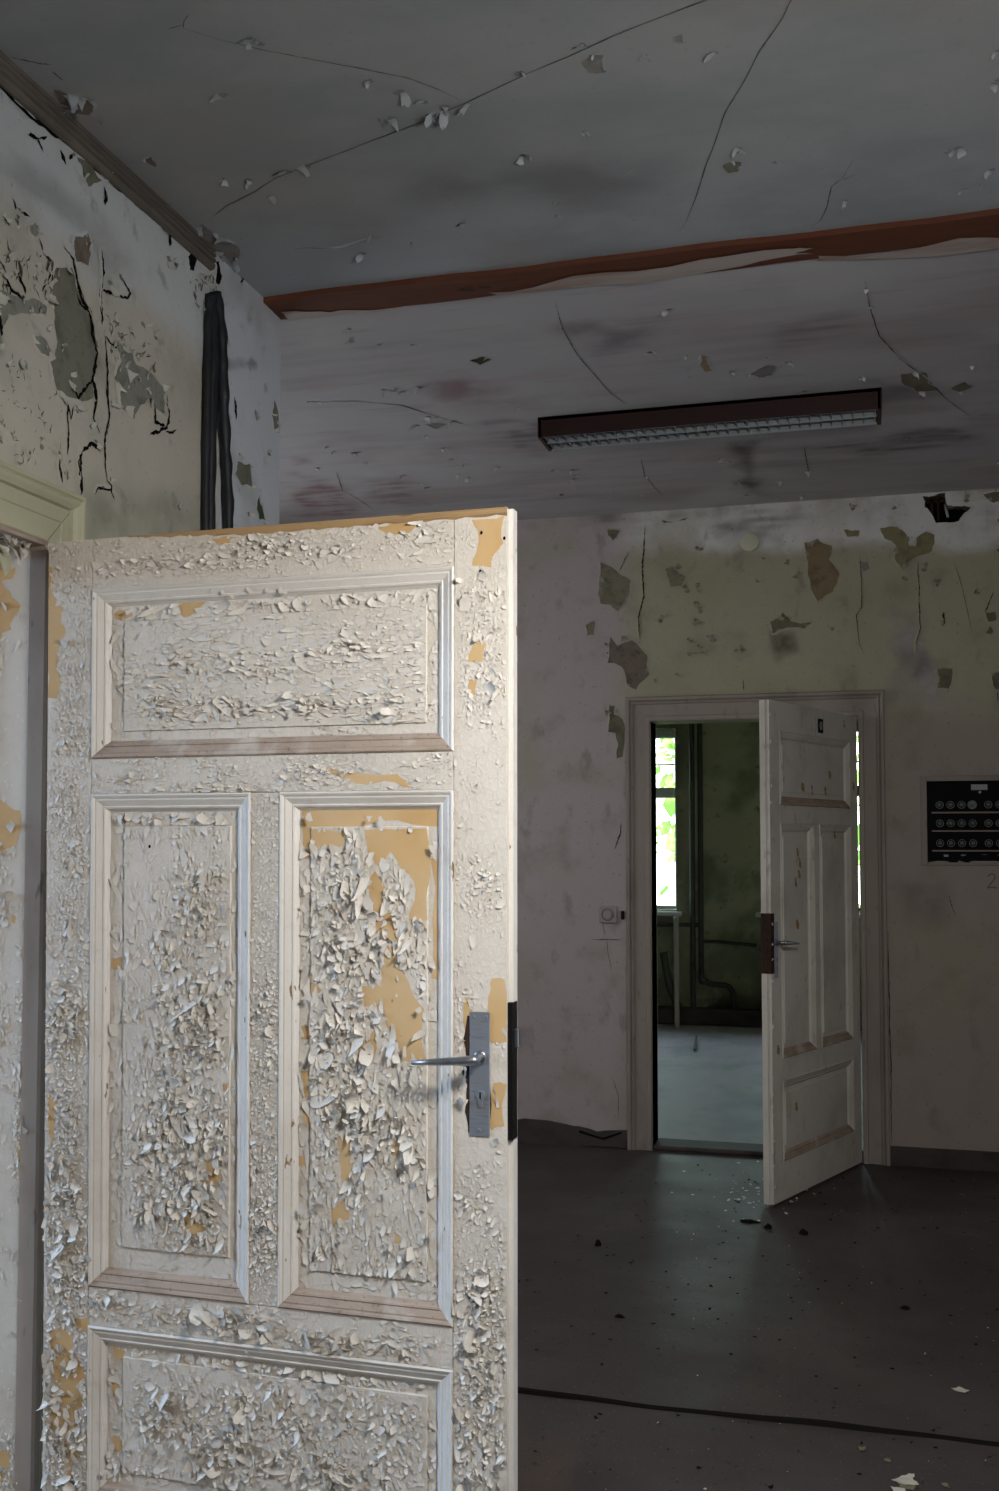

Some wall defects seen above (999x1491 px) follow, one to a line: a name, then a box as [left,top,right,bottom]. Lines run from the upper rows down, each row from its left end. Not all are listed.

crack [169,0,708,222]
crack [681,0,794,229]
peeling [0,230,171,449]
crack [0,199,176,498]
crack [552,299,624,404]
crack [865,282,993,416]
peeling [901,365,975,397]
peeling [585,560,656,690]
crack [619,459,662,643]
peeling [768,489,999,636]
peeling [605,703,625,761]
peeling [0,453,507,1491]